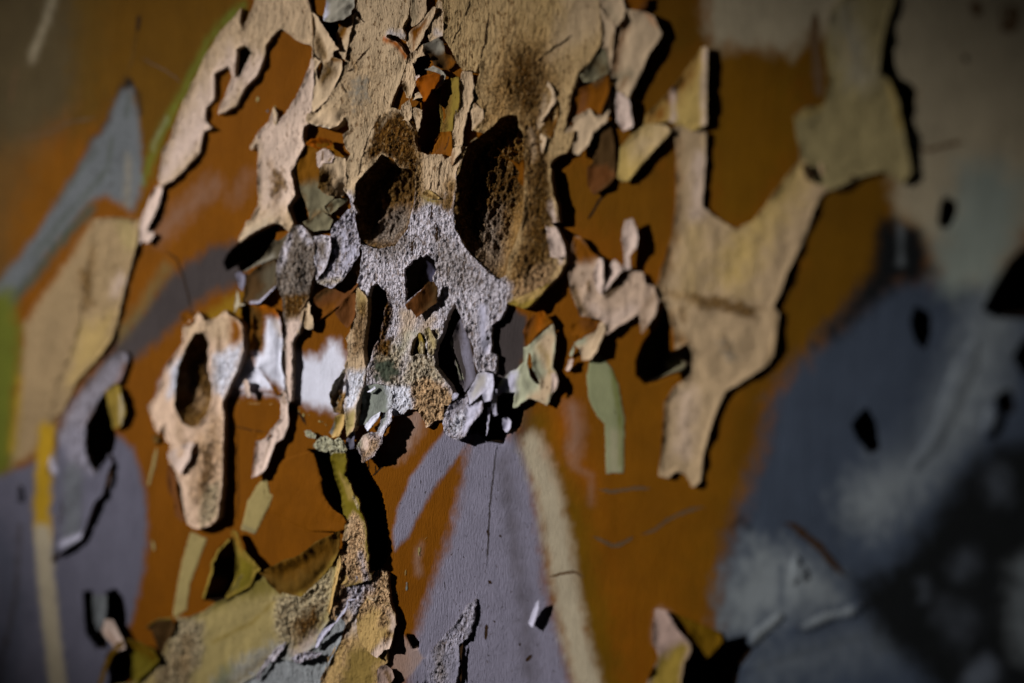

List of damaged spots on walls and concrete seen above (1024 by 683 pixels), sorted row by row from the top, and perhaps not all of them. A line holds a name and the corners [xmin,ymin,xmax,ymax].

peeling [45,0,914,555]
peeling [85,451,399,683]
peeling [647,609,752,683]